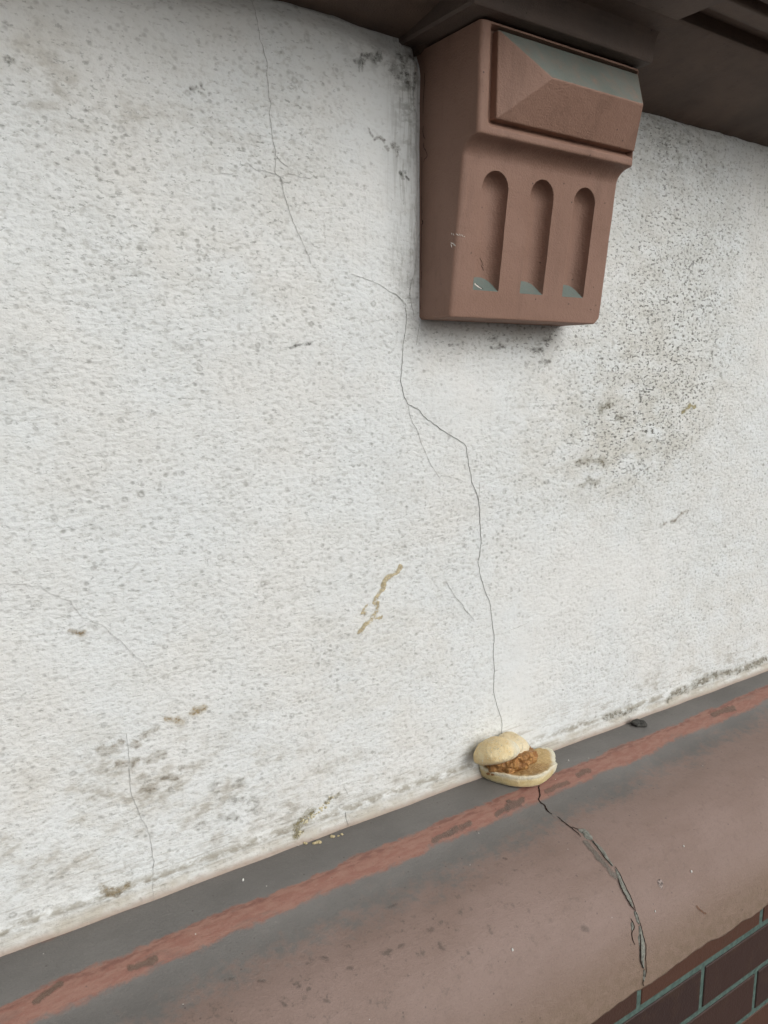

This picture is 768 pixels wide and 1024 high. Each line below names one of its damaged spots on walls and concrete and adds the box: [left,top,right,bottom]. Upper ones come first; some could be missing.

crack [225,3,325,264]
crack [353,198,529,734]
leakage [293,793,339,838]
crack [538,786,647,986]